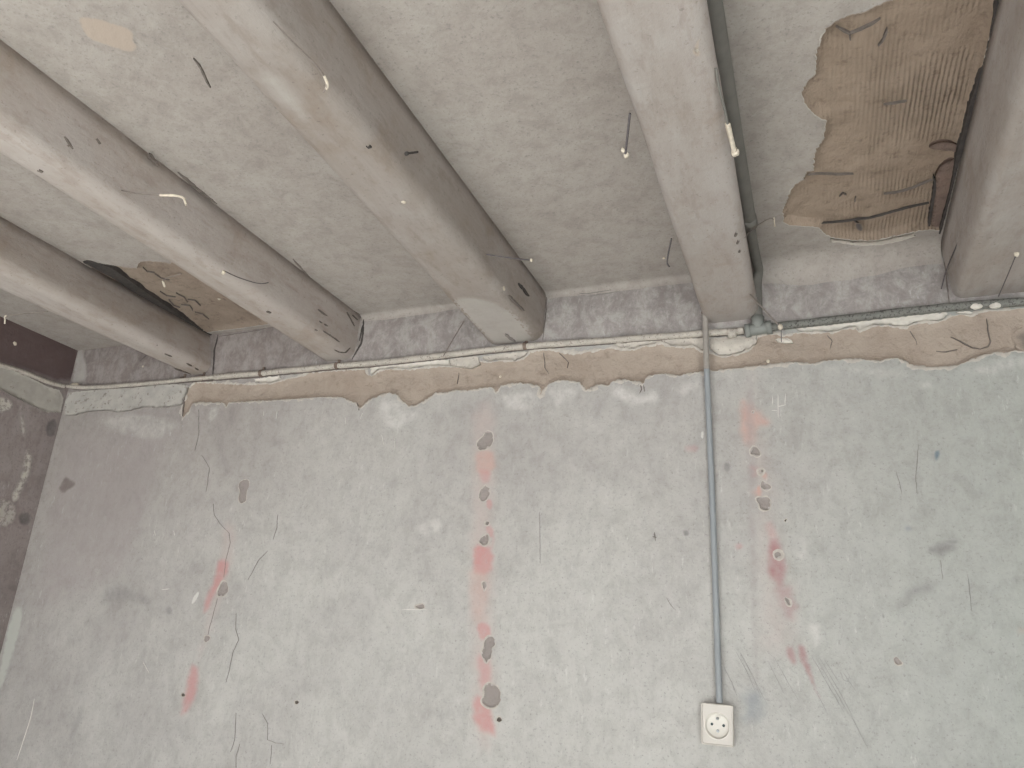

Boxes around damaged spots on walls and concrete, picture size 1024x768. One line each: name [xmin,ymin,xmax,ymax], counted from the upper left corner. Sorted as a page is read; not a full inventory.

flaking render [782,0,994,241]
flaking render [82,261,271,333]
flaking render [165,307,1024,420]
crack [83,260,744,579]
flaking render [476,430,494,451]
flaking render [749,445,772,512]
flaking render [480,635,496,664]
flaking render [480,682,502,723]